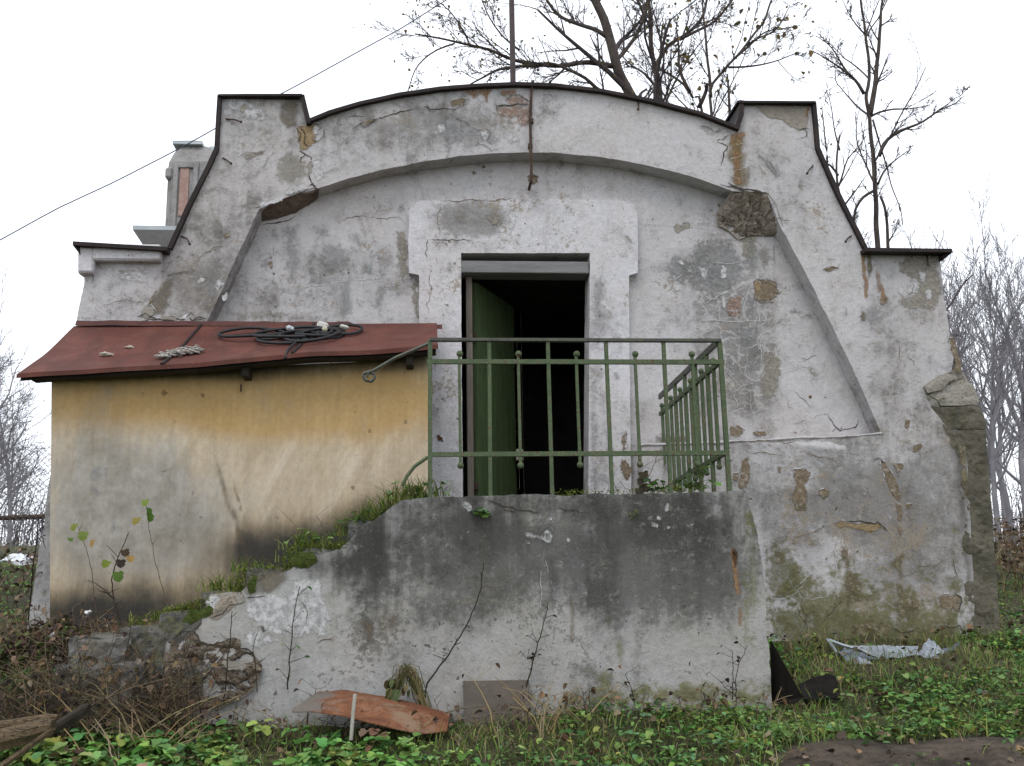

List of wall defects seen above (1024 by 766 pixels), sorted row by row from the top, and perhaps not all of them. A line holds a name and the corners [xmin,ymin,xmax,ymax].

spalling [297,122,325,150]
peeling [438,94,530,151]
spalling [256,184,319,224]
spalling [656,182,790,399]
rust [862,255,887,305]
peeling [777,467,830,510]
peeling [795,458,912,538]
peeling [161,572,330,707]